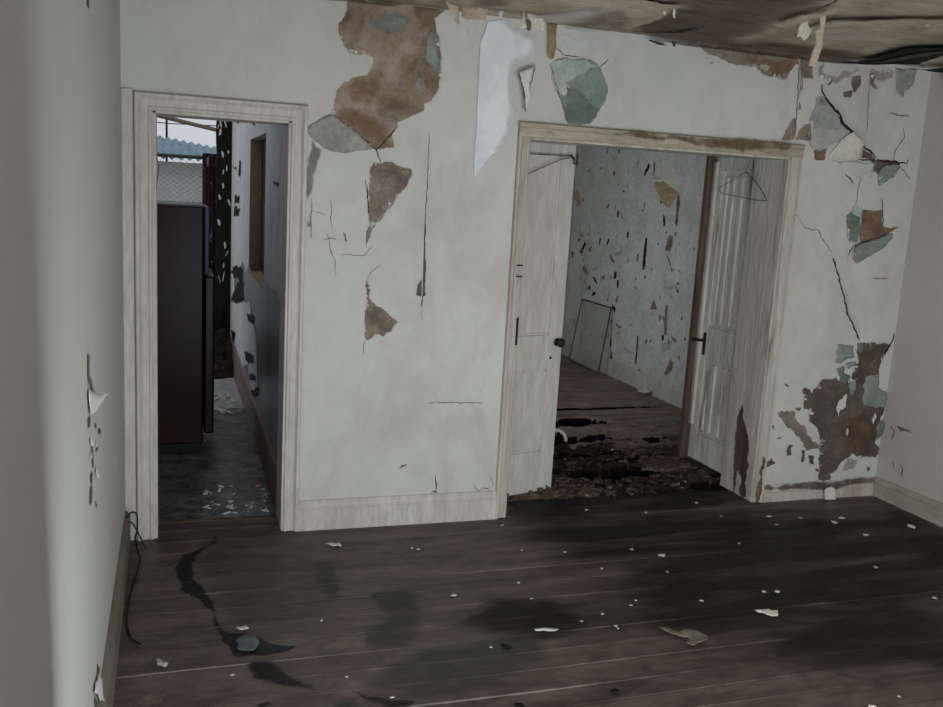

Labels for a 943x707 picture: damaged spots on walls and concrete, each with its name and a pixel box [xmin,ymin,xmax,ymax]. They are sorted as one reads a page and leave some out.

flaking render [330,1,504,246]
peeling [521,13,567,60]
water stain [633,0,853,64]
flaking render [702,48,917,98]
crack [782,69,909,160]
flaking render [362,265,400,355]
crack [416,133,430,317]
peeling [571,195,685,375]
crack [796,215,863,340]
flaking render [845,202,900,265]
flaking render [772,335,894,482]
peeling [88,417,101,507]